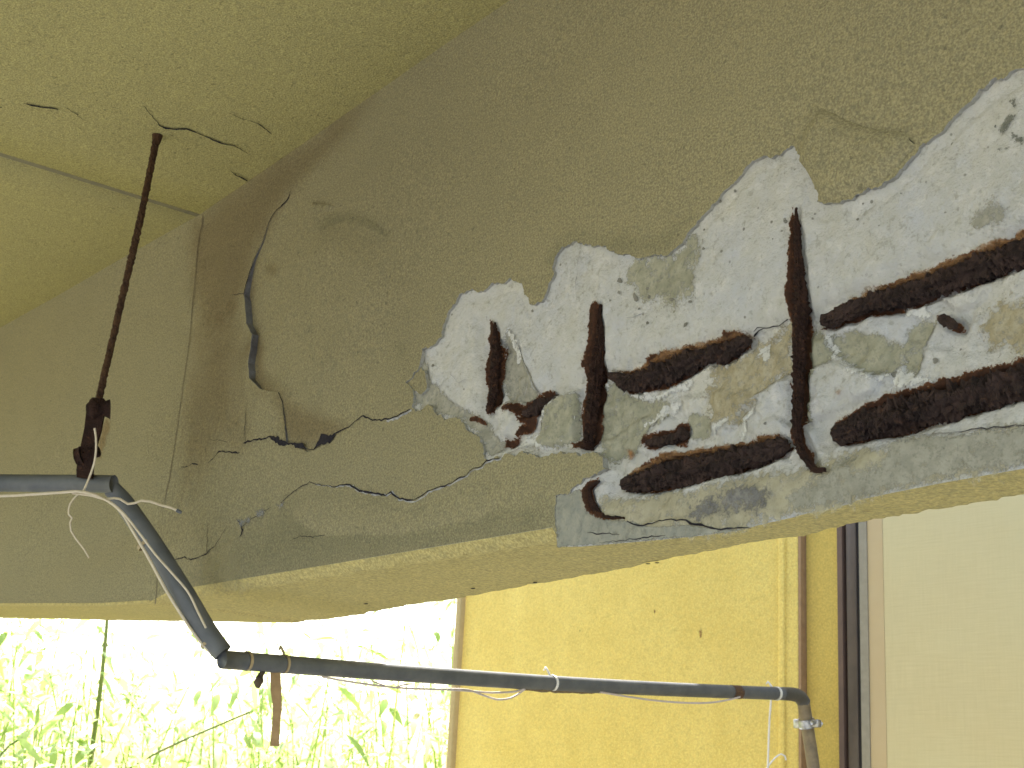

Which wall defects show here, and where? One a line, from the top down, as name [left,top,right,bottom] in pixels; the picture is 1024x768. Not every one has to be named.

crack [144,106,248,181]
crack [233,190,291,295]
spalling [407,70,1024,522]
rust [784,207,805,354]
rust [840,229,1024,305]
crack [185,392,411,467]
rust [469,319,556,449]
rust [571,301,608,451]
rust [620,271,1024,475]
crack [175,458,501,560]
rust [580,477,616,520]
spalling [562,462,1024,547]